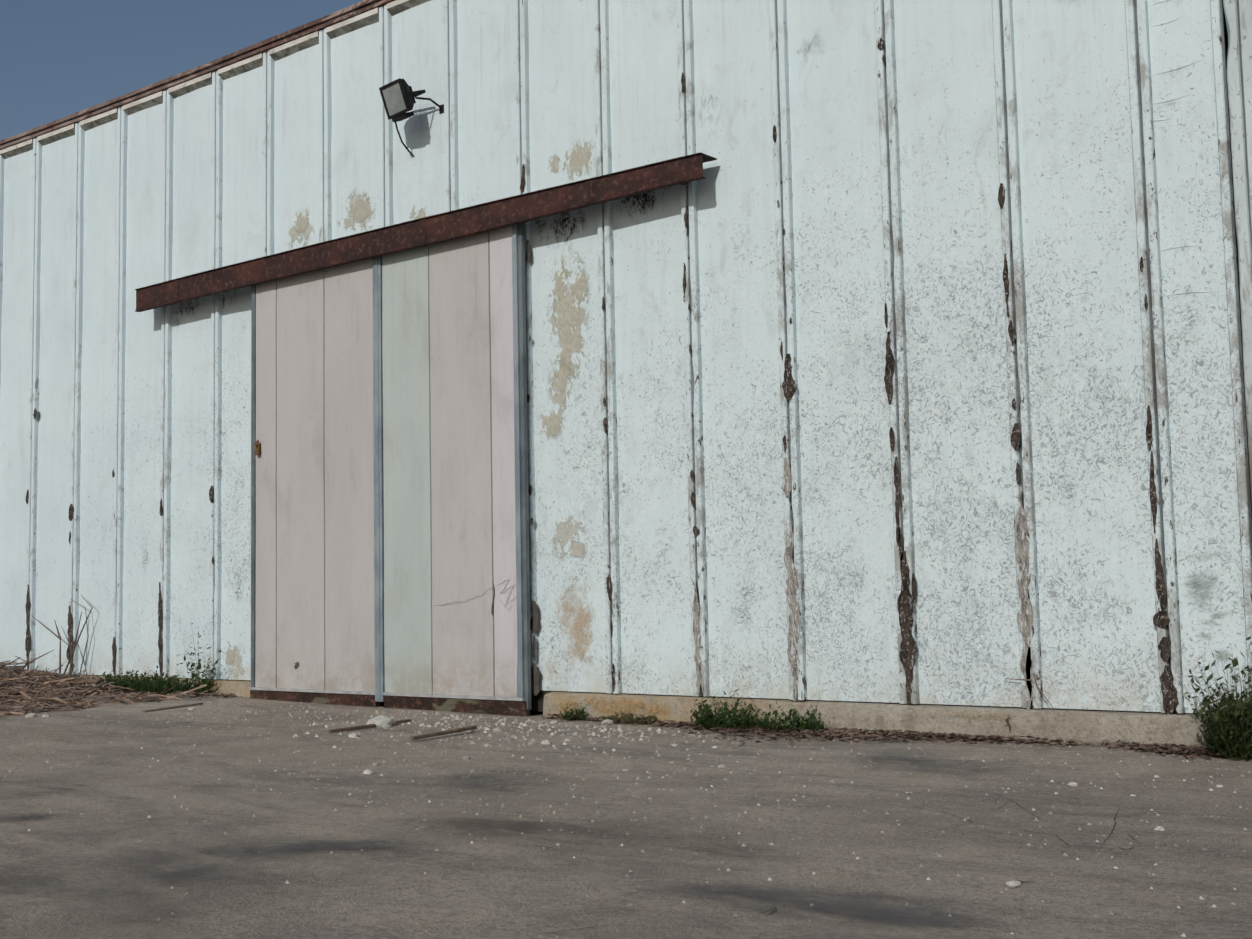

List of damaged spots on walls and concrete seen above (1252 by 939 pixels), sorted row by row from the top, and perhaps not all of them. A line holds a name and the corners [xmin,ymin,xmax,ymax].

peeling [550,144,591,177]
peeling [289,211,311,247]
peeling [344,194,372,230]
peeling [542,260,588,436]
peeling [553,516,585,557]
peeling [530,601,540,696]